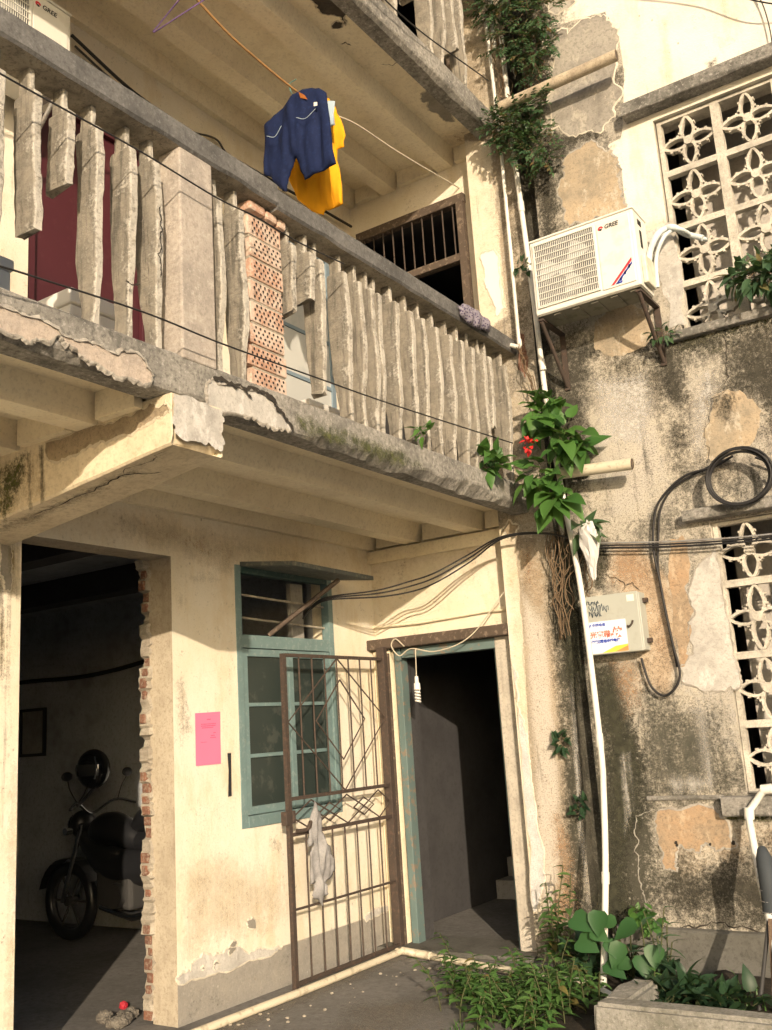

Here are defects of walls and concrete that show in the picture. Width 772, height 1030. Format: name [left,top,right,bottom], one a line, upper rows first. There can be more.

peeling [310,0,347,29]
peeling [542,0,628,227]
peeling [0,304,292,464]
leakage [597,330,735,458]
peeling [703,390,761,461]
crack [34,451,165,515]
peeling [668,535,743,694]
peeling [653,802,738,872]
peeling [175,939,283,986]